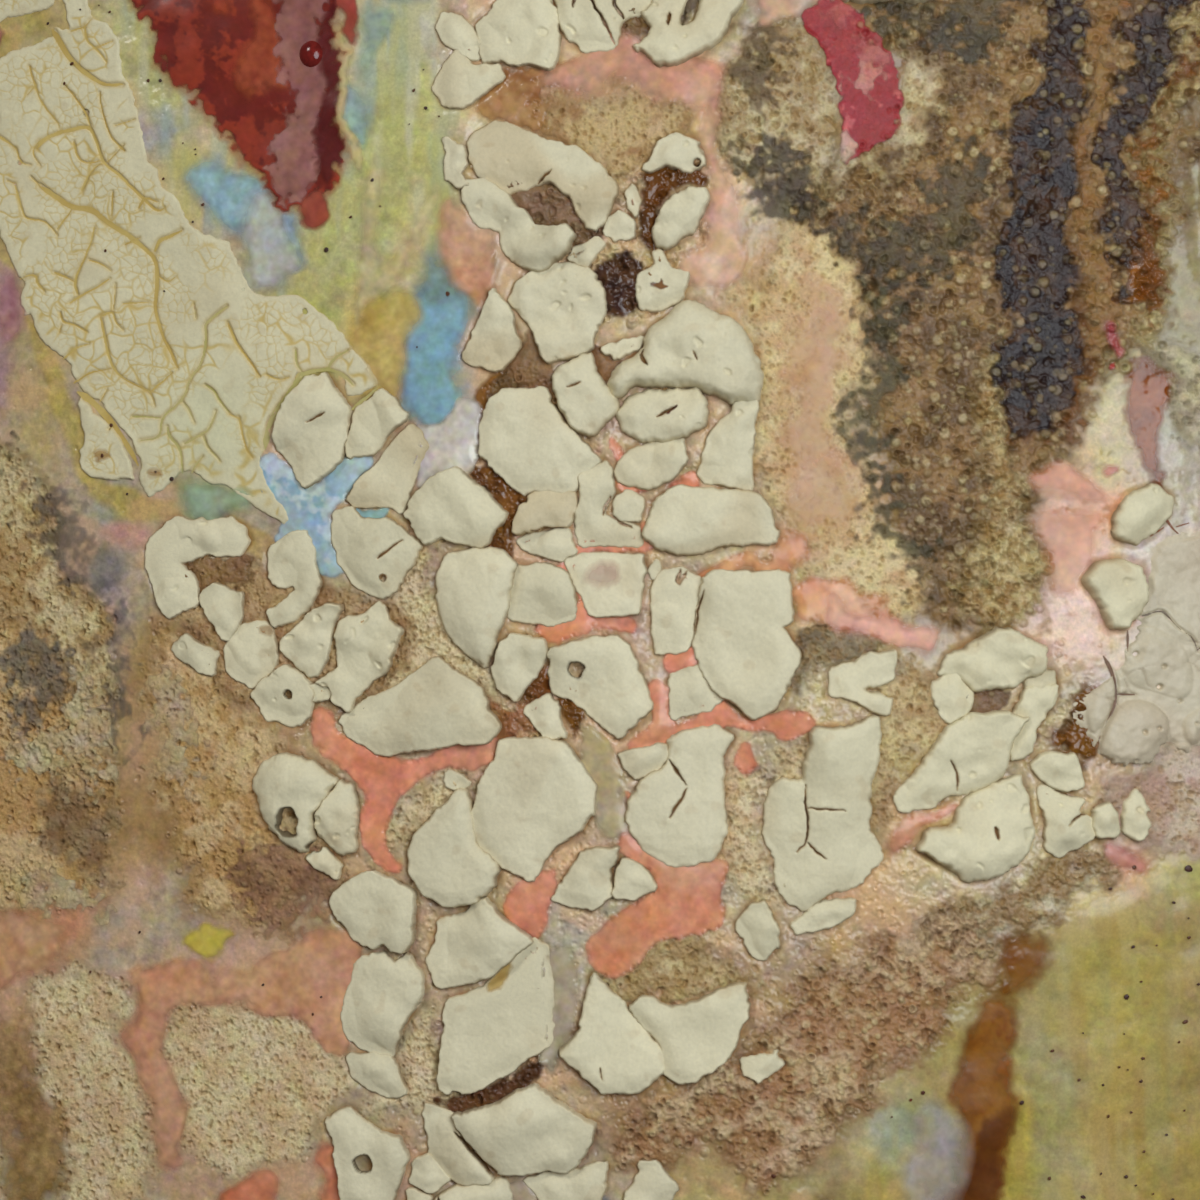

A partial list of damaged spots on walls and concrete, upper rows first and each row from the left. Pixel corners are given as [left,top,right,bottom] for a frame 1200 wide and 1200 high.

crack [0,22,380,474]
rust [1128,259,1162,311]
rust [1125,357,1170,487]
peeling [1111,483,1174,546]
crack [1150,520,1189,537]
peeling [0,0,802,1200]
peeling [1081,558,1150,630]
crack [1099,611,1200,738]
peeling [893,627,1152,883]
peeling [735,715,884,961]
rust [949,935,1047,1200]